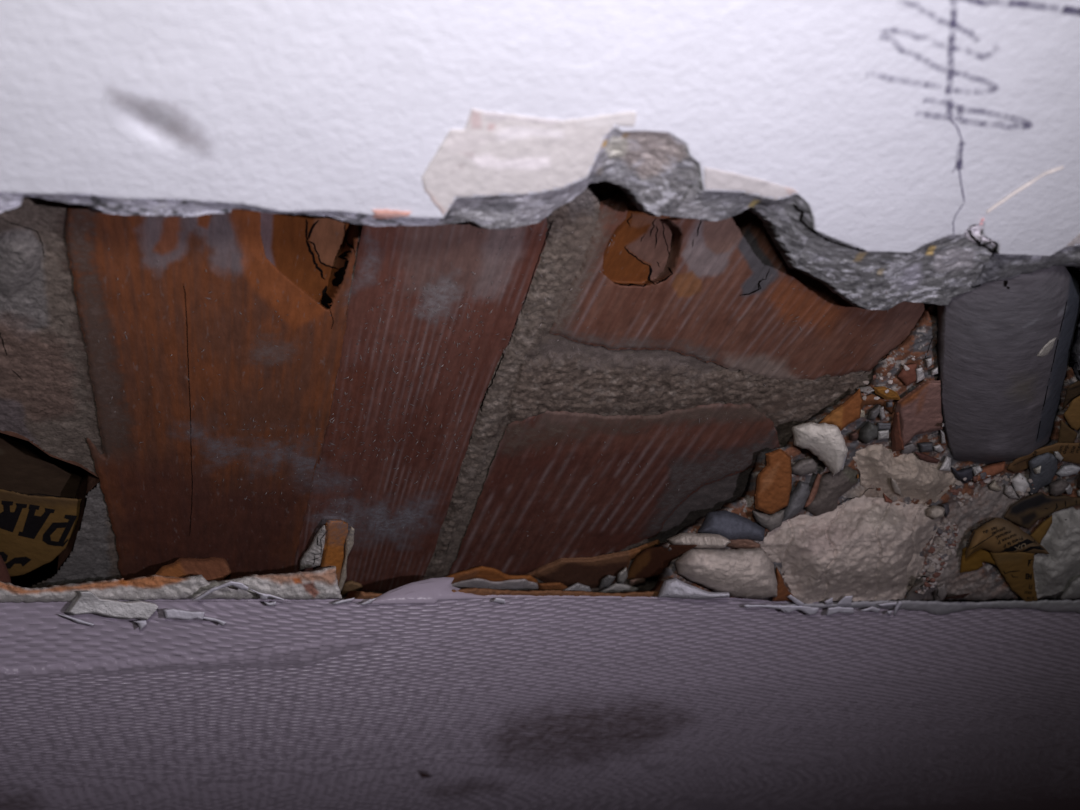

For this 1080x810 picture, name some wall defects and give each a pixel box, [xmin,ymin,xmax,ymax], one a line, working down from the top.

crack [949,118,965,235]
peeling [0,108,998,310]
spalling [915,357,938,383]
spalling [877,406,889,440]
spalling [933,423,951,471]
spalling [988,465,1041,499]
spalling [1054,451,1080,497]
peeling [163,581,284,626]